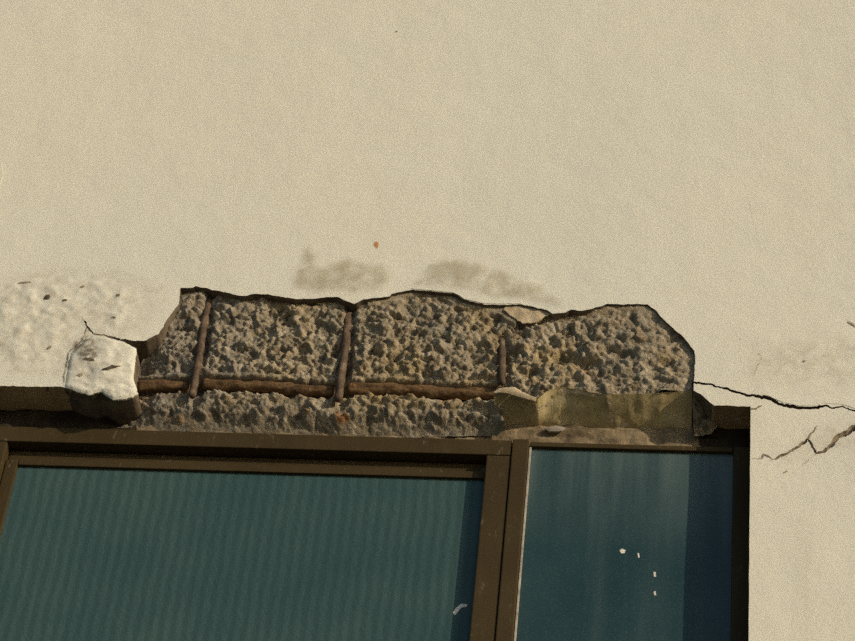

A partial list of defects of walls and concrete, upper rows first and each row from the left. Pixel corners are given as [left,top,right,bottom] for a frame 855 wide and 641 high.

spalling [65,283,720,438]
crack [692,381,855,465]